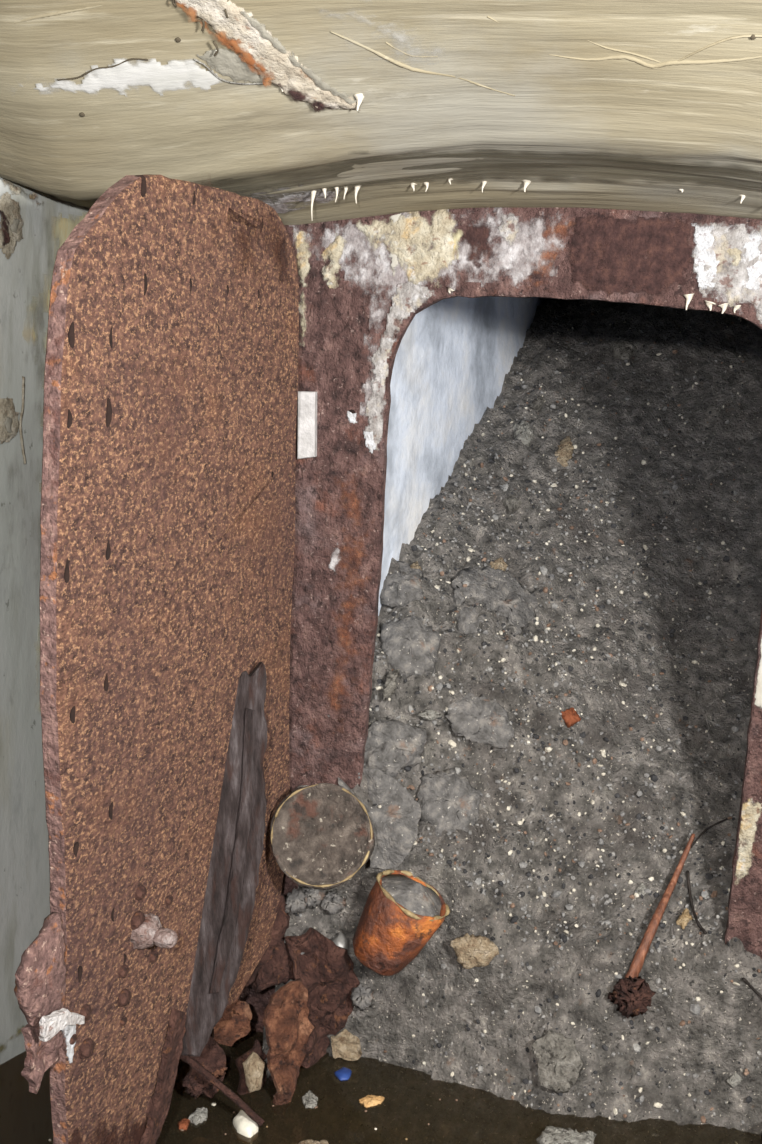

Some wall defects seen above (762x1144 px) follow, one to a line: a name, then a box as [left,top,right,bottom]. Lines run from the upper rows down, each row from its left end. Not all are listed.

spalling [35,0,361,112]
leakage [221,152,762,213]
rust [465,223,494,268]
rust [541,216,694,295]
leakage [692,223,762,324]
leakage [274,209,564,453]
leakage [329,548,341,571]
leakage [735,799,762,884]
rust [21,1024,64,1094]